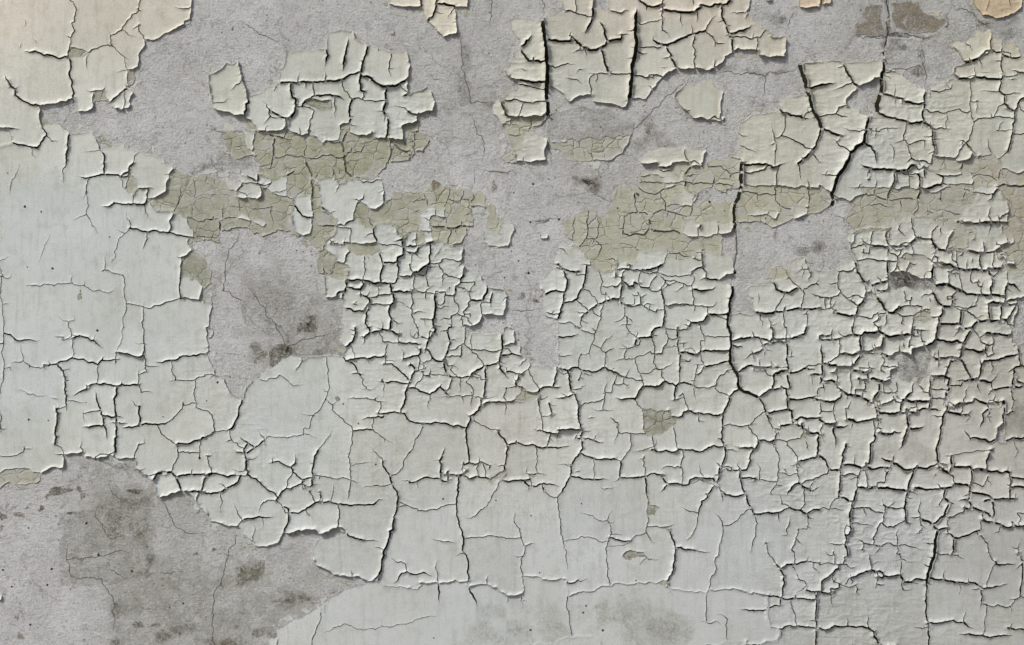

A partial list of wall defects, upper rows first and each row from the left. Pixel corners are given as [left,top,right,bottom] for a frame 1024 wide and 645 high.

crack [10,128,70,178]
crack [21,0,145,106]
crack [74,150,154,229]
crack [114,38,418,257]
peeling [0,0,1024,427]
crack [460,0,765,159]
crack [619,166,693,237]
crack [708,62,891,274]
crack [859,38,1024,215]
crack [962,173,1024,233]
peeling [0,125,478,645]
crack [48,211,1024,645]